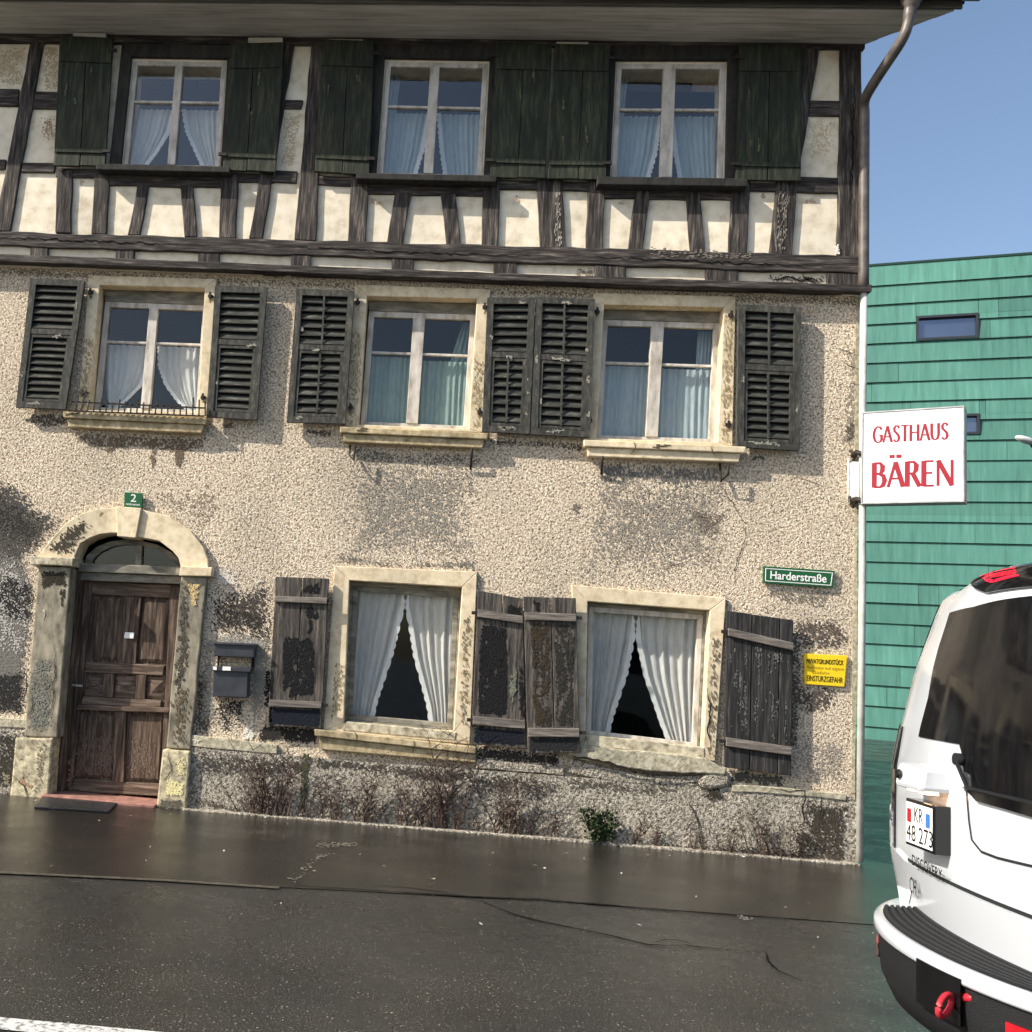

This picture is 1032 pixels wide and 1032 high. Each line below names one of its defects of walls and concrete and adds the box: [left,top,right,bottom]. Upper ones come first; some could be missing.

leakage [25,339,205,468]
leakage [0,481,92,622]
leakage [0,671,26,715]
leakage [170,582,272,748]